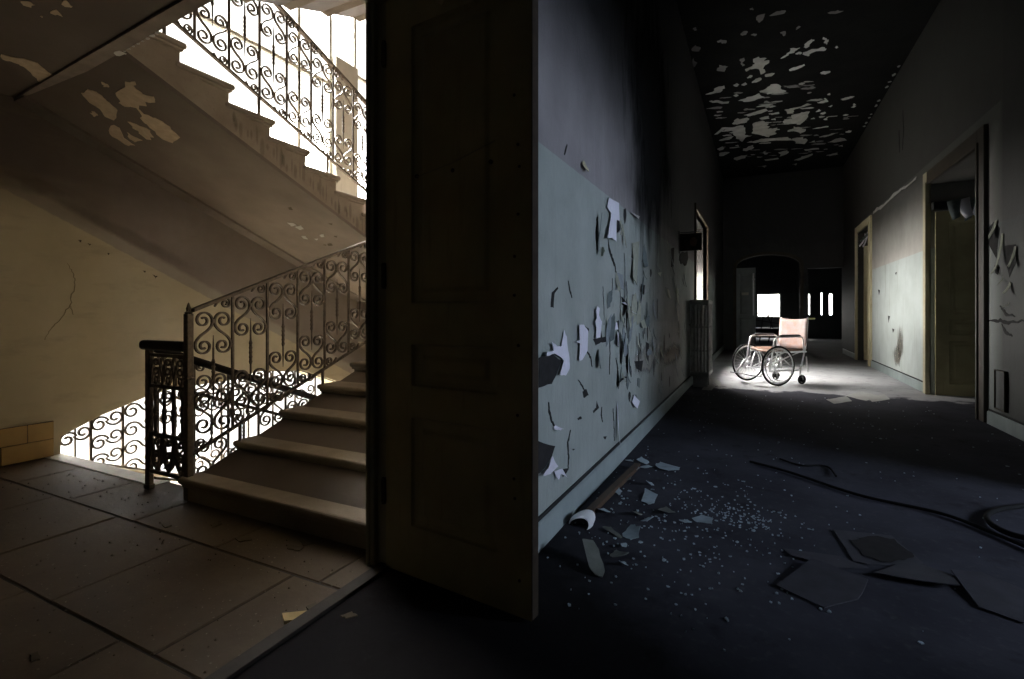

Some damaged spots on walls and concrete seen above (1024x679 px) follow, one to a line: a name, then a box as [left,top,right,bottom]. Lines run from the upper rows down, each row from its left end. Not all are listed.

flaking render [740,8,786,36]
flaking render [1,54,52,82]
flaking render [81,81,180,146]
flaking render [705,37,856,168]
peeling [988,219,1017,307]
peeling [539,198,688,441]
peeling [538,402,575,480]